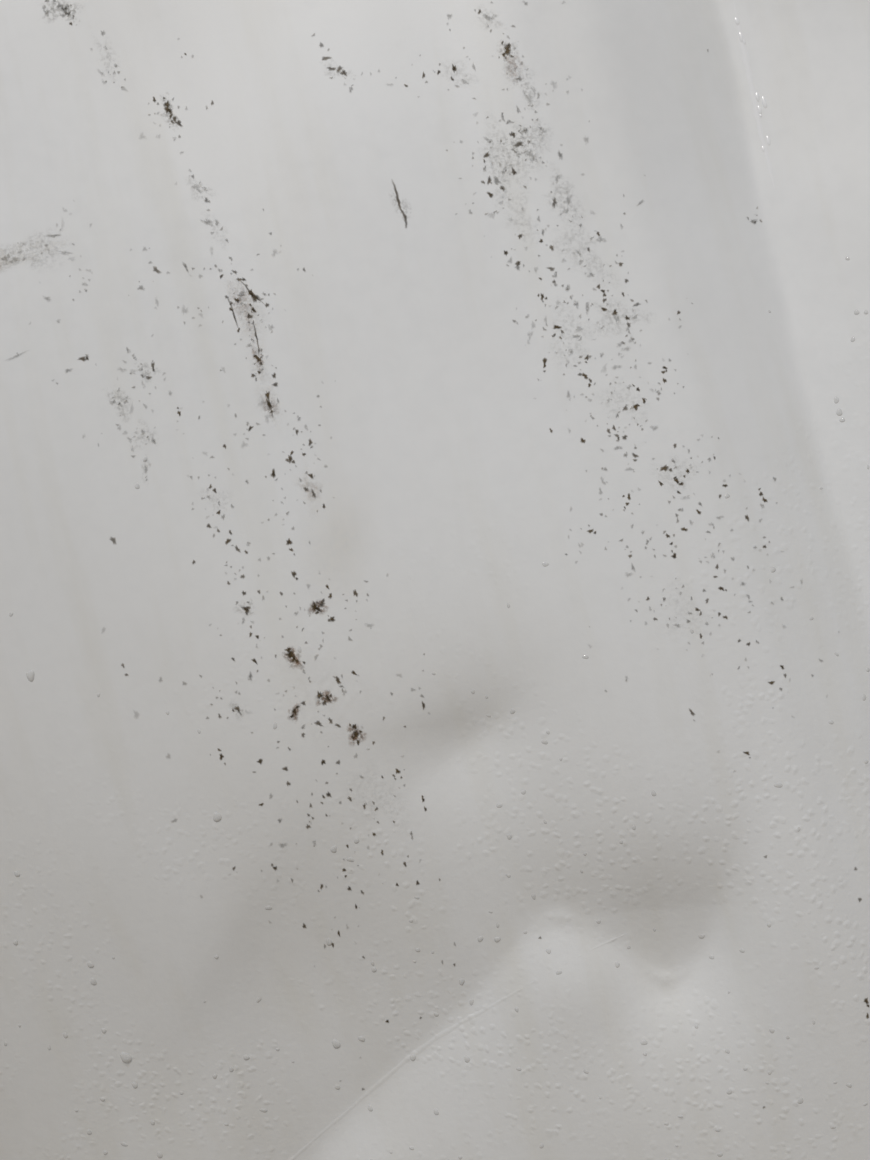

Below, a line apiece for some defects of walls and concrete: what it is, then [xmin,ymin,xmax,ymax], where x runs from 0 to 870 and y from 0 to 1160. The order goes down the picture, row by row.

leakage [220,271,269,332]
leakage [290,677,340,718]